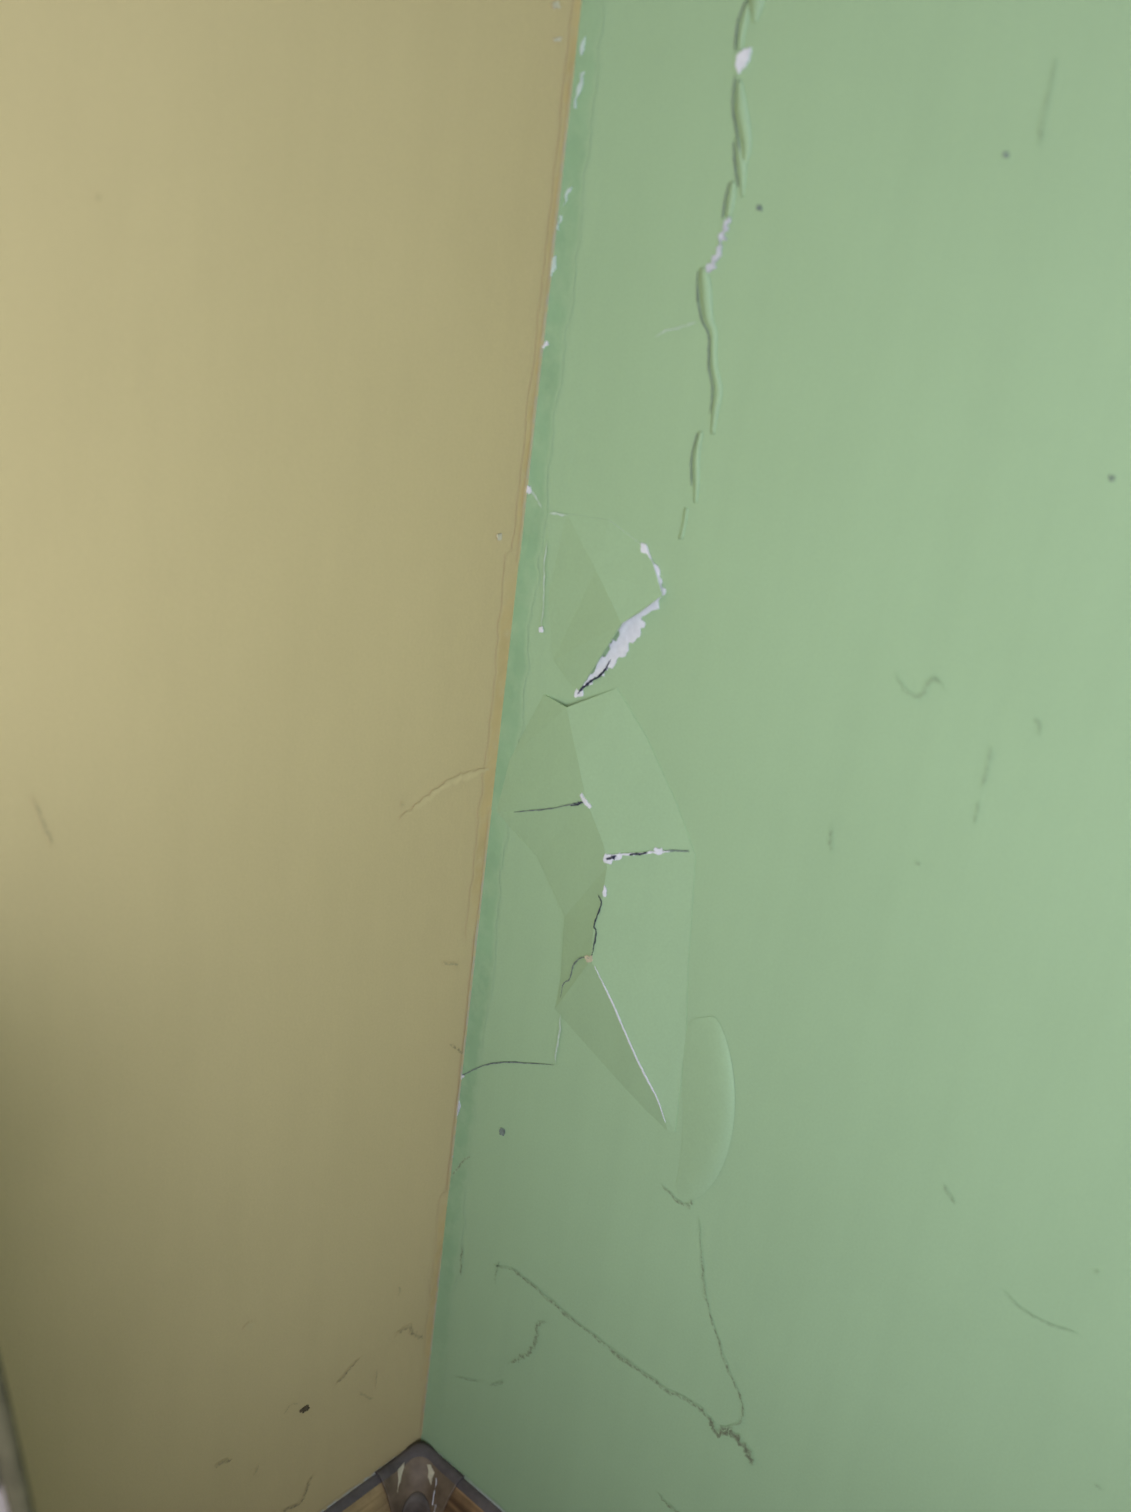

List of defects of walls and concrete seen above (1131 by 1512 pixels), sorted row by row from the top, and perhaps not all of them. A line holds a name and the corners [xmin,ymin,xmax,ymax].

crack [519,793,592,812]
crack [603,847,690,864]
crack [461,1014,562,1079]